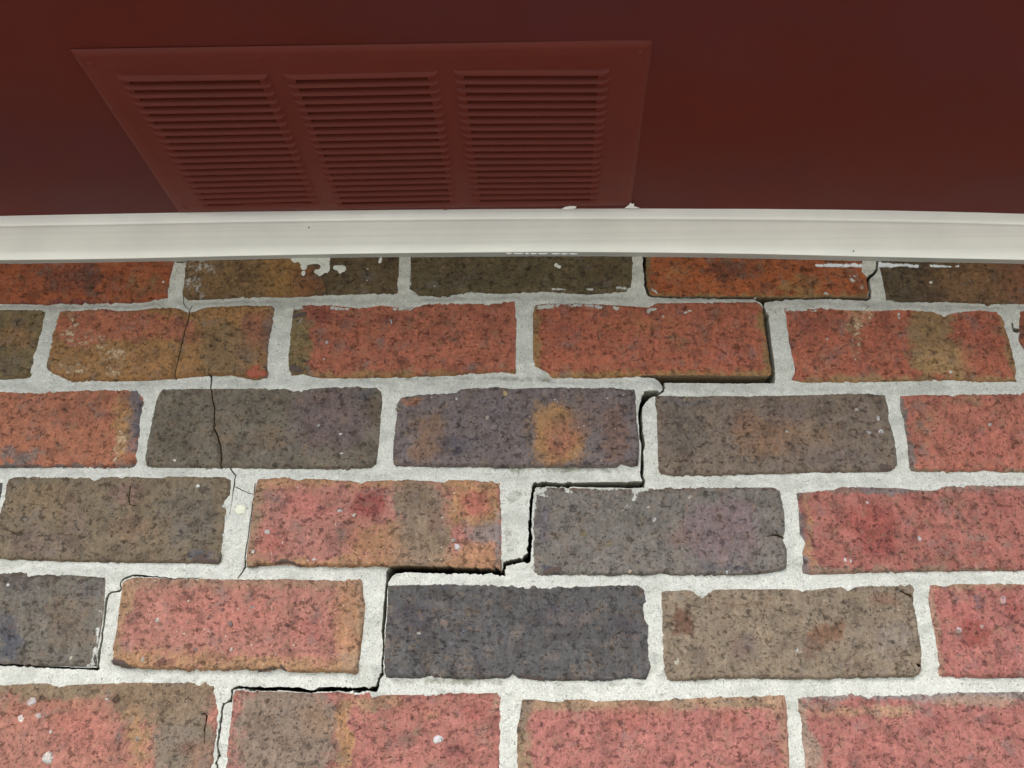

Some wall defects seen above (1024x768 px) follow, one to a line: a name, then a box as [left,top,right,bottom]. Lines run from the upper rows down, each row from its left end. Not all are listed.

crack [174,292,192,380]
crack [208,257,878,768]
crack [0,574,200,671]